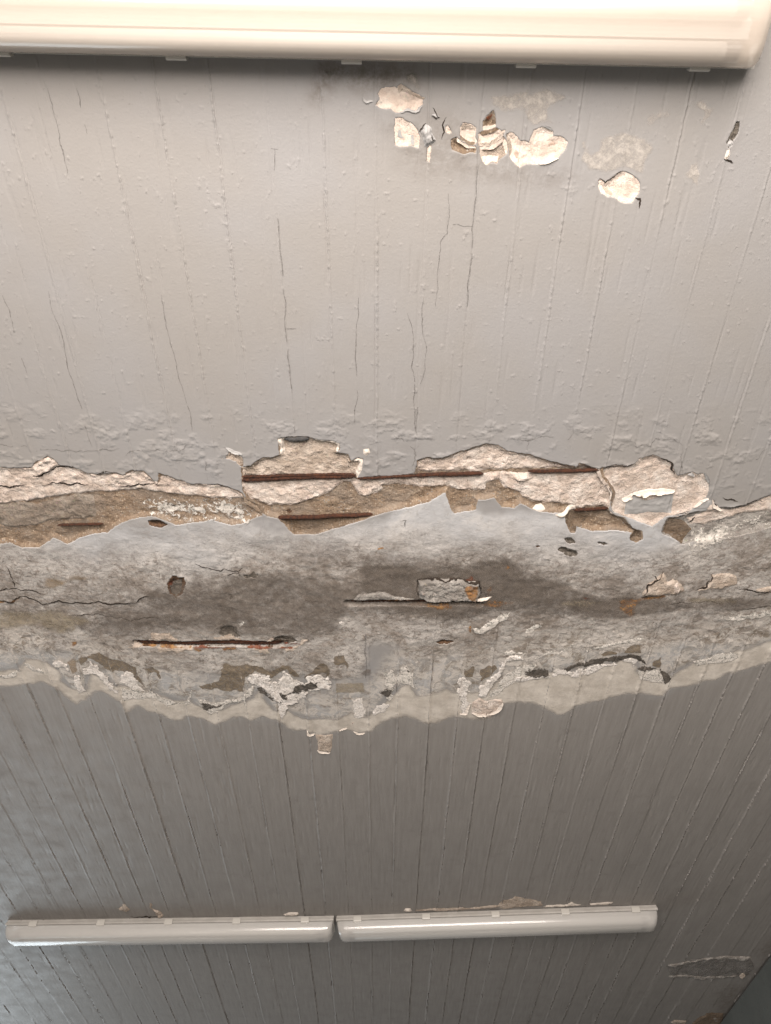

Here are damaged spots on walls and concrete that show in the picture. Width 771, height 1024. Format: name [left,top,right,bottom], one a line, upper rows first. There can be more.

peeling [363,84,431,162]
peeling [442,110,568,167]
peeling [598,171,641,208]
crack [277,218,295,389]
crack [393,163,480,466]
crack [1,297,208,480]
crack [352,298,360,423]
spalling [0,437,771,557]
crack [0,569,158,627]
leakage [2,561,668,636]
spalling [350,577,493,606]
spalling [128,625,308,654]